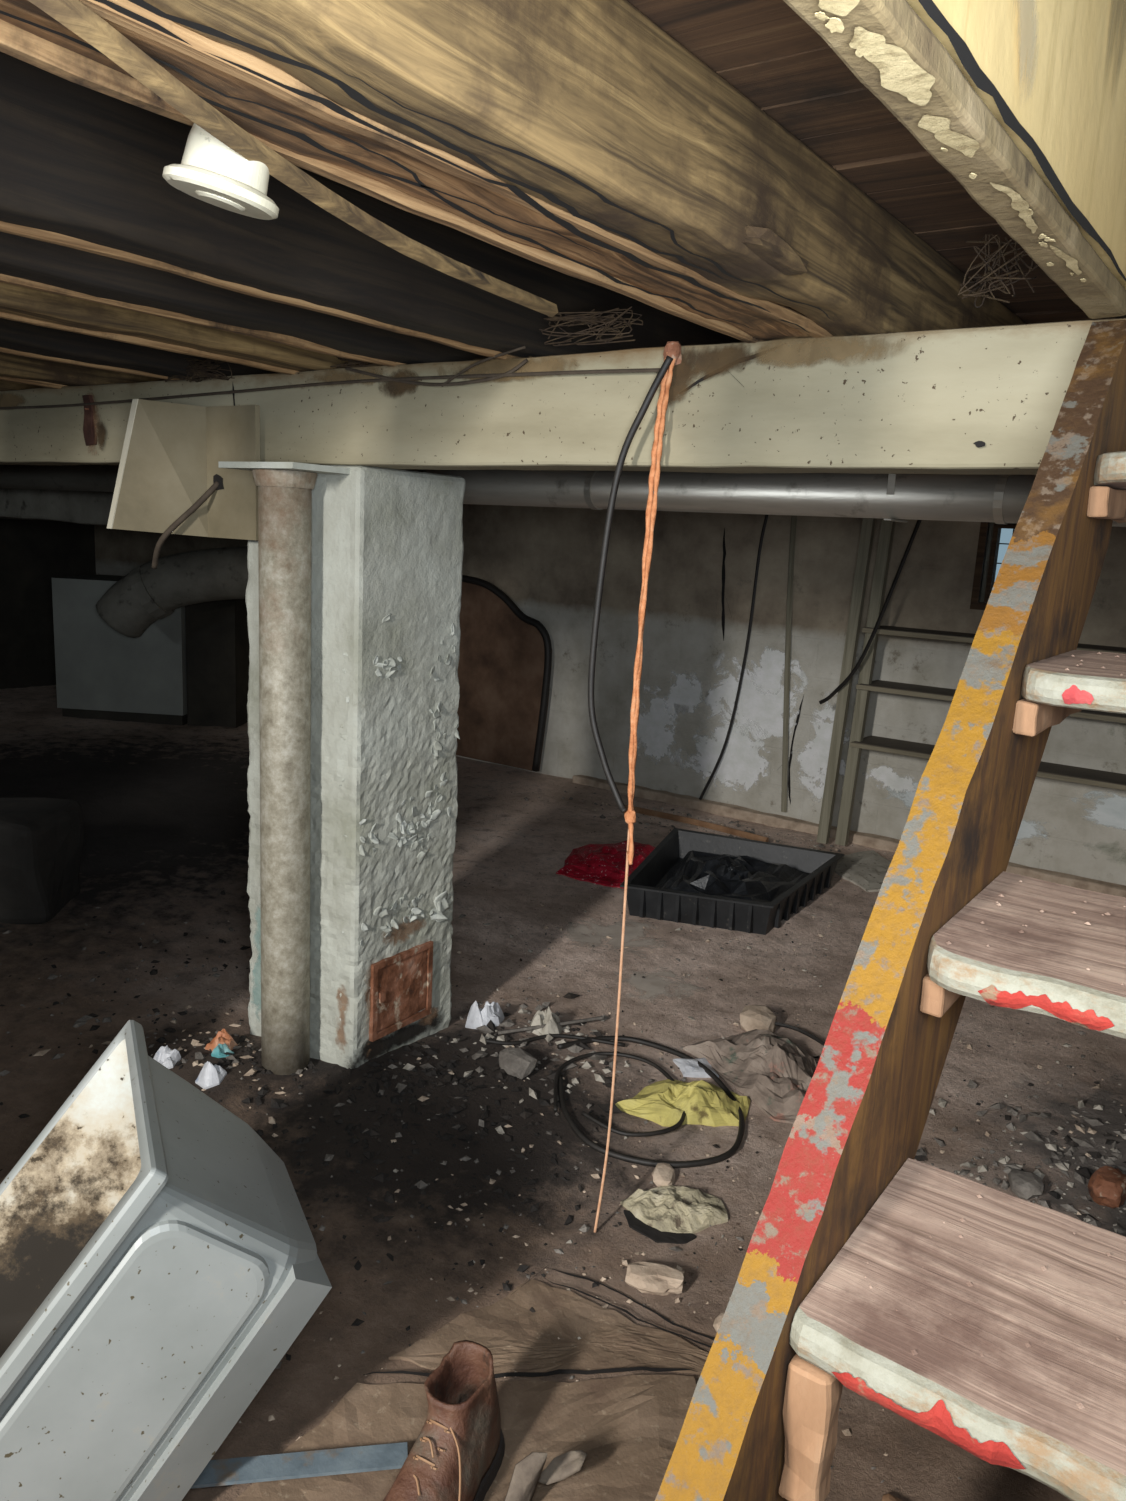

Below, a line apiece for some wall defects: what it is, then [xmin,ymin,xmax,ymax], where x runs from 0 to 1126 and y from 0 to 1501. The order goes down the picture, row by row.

peeling [815,0,1087,282]
peeling [373,655,403,681]
peeling [344,701,460,865]
damp [863,766,919,807]
damp [1077,791,1126,830]
damp [1014,820,1047,846]
peeling [342,890,450,946]
rust [384,920,422,944]